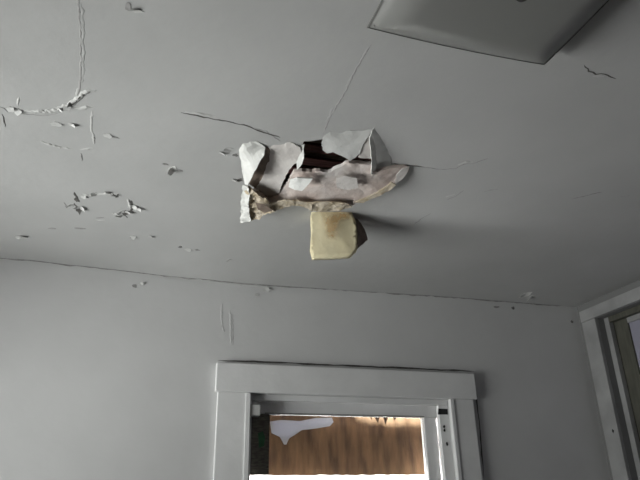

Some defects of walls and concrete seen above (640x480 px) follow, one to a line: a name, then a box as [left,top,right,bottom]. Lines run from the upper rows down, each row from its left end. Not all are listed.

crack [77,0,86,96]
crack [584,65,616,79]
peeling [1,88,96,160]
crack [181,111,279,139]
spalling [304,151,372,162]
peeling [336,176,358,190]
peeling [64,192,141,217]
crack [219,303,472,372]
crack [476,392,484,476]